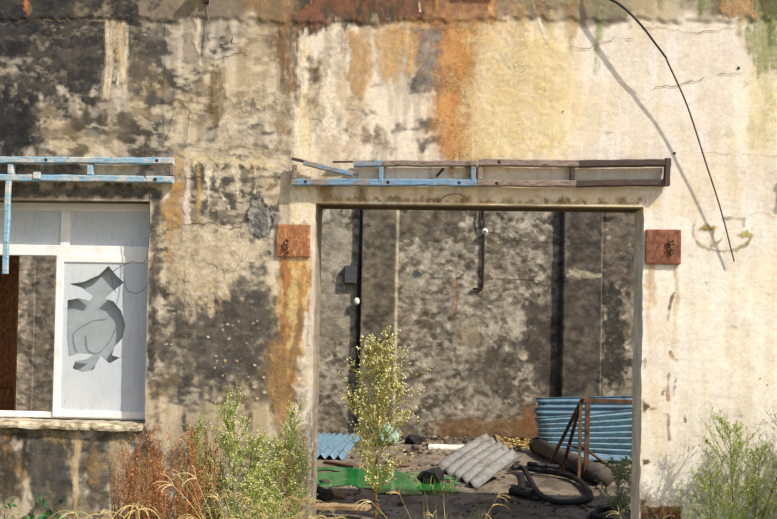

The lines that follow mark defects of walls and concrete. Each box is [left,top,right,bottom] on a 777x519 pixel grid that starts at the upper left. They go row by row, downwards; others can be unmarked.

damp [0,0,163,199]
crack [0,17,291,179]
corrosion [241,0,499,174]
damp [274,11,566,225]
corrosion [507,0,579,25]
crack [648,72,753,88]
spalling [246,198,274,238]
damp [147,256,296,411]
corrosion [268,256,312,513]
damp [0,421,166,518]
corrosion [641,505,682,519]